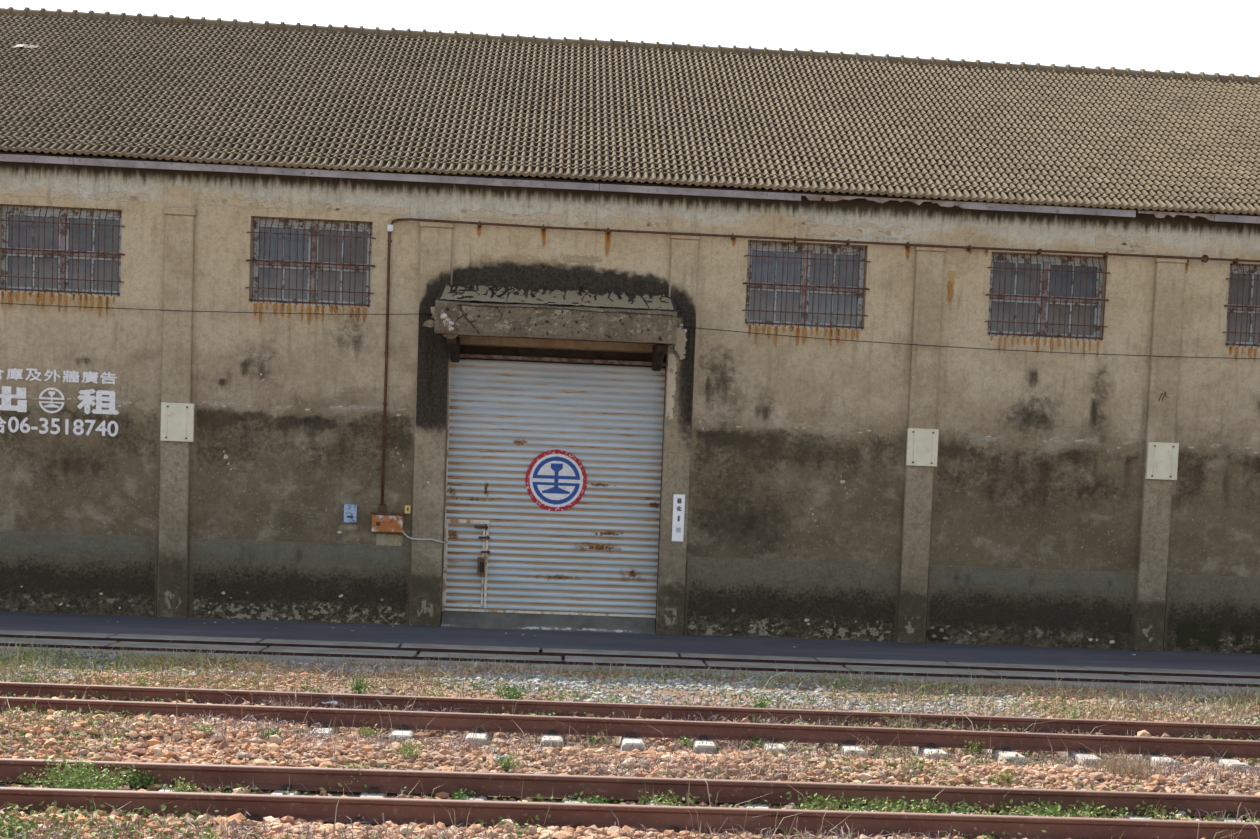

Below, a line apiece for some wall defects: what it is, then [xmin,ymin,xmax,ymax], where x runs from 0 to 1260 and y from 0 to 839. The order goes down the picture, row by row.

corrosion [1,291,115,315]
corrosion [254,303,367,323]
corrosion [749,325,859,345]
spalling [423,285,687,421]
corrosion [991,336,1099,355]
leakage [938,405,1097,495]
corrosion [579,532,623,552]